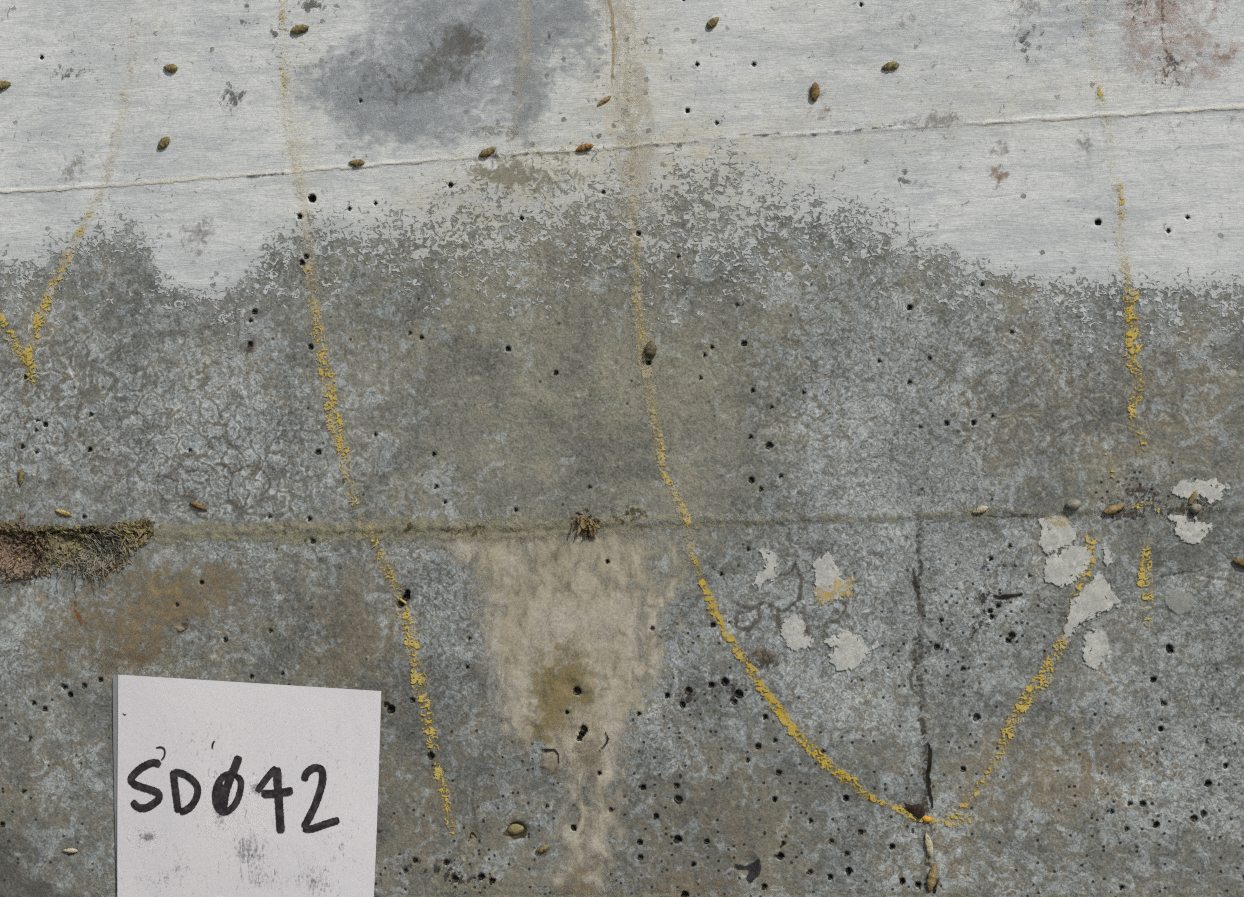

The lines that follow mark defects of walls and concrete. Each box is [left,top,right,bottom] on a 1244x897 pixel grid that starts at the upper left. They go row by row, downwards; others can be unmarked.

leakage [0,0,595,194]
peeling [1171,478,1231,504]
peeling [1168,514,1212,544]
peeling [752,548,778,587]
peeling [813,551,855,604]
peeling [1038,516,1121,671]
peeling [781,614,880,671]
leakage [151,512,801,897]
crack [910,534,939,894]